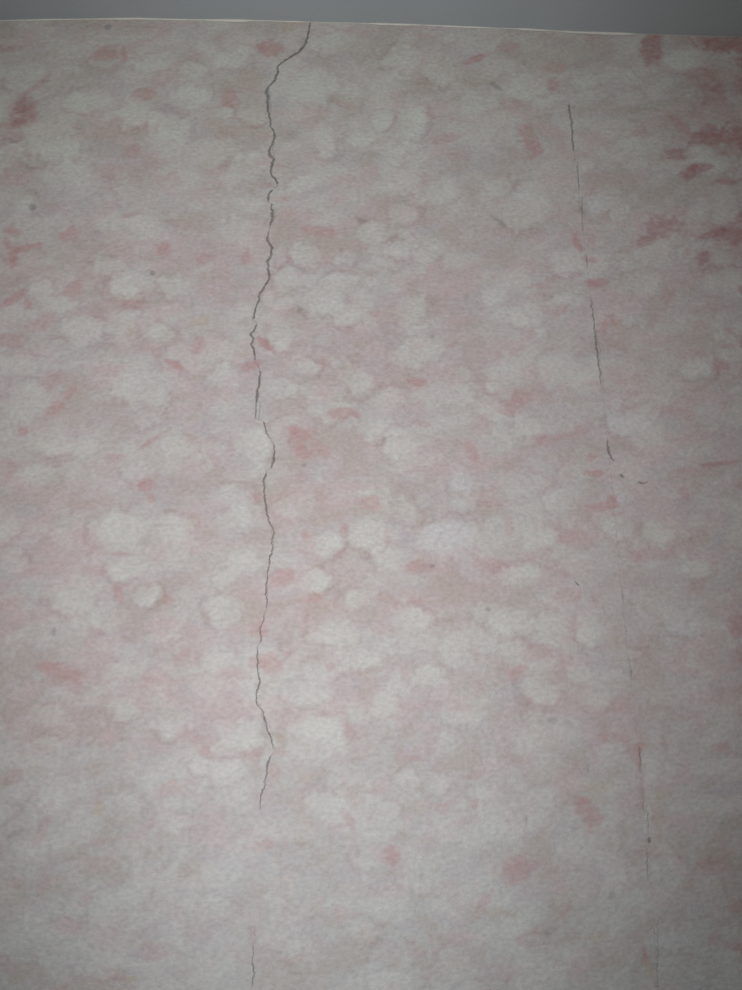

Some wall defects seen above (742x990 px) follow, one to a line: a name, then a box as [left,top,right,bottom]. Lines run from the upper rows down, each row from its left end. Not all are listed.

crack [250,24,310,603]